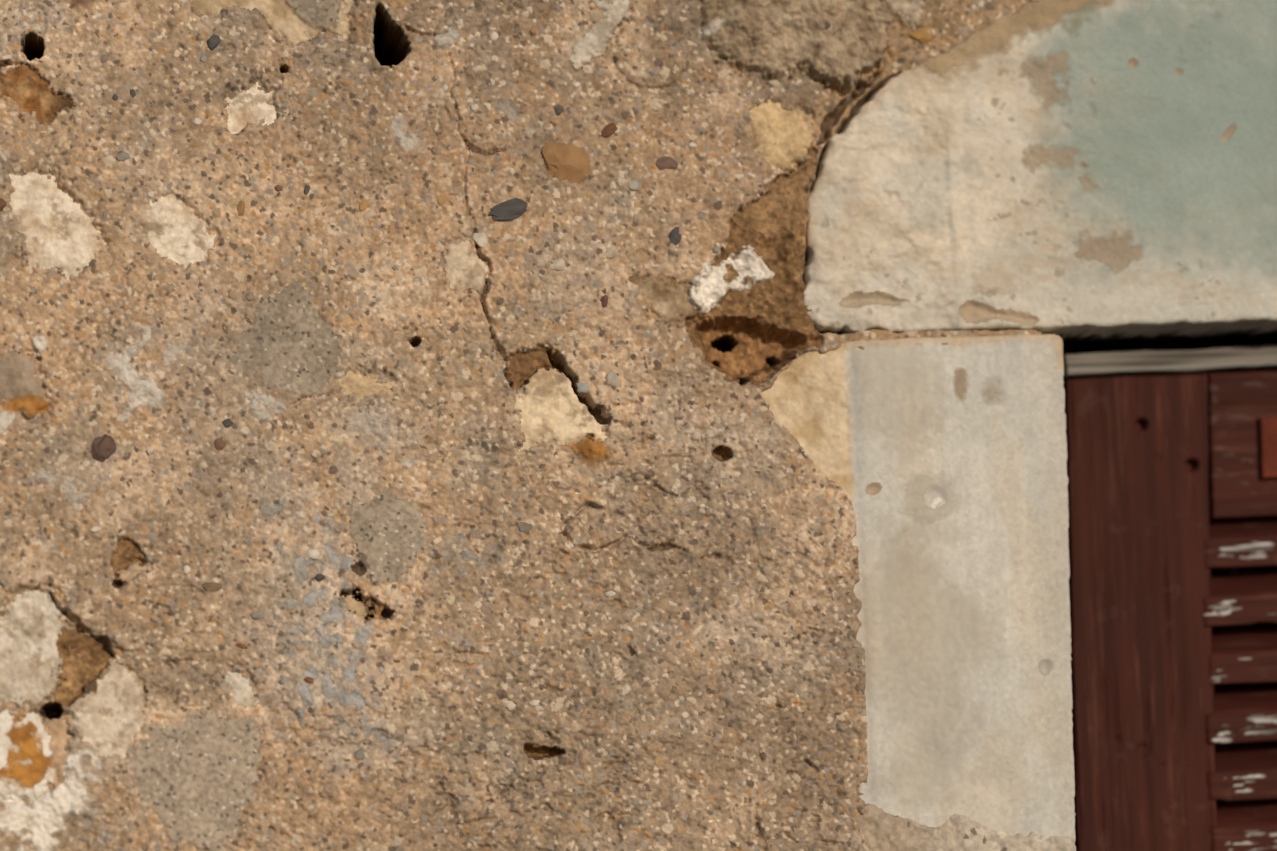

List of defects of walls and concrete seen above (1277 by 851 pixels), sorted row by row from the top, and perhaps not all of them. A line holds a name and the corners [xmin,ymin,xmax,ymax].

flaking render [0,61,75,126]
peeling [1022,52,1068,106]
crack [467,145,501,155]
flaking render [629,100,823,386]
peeling [1077,232,1141,268]
crack [480,278,488,312]
spalling [959,300,1040,325]
flaking render [0,334,49,433]
flaking render [0,588,145,801]